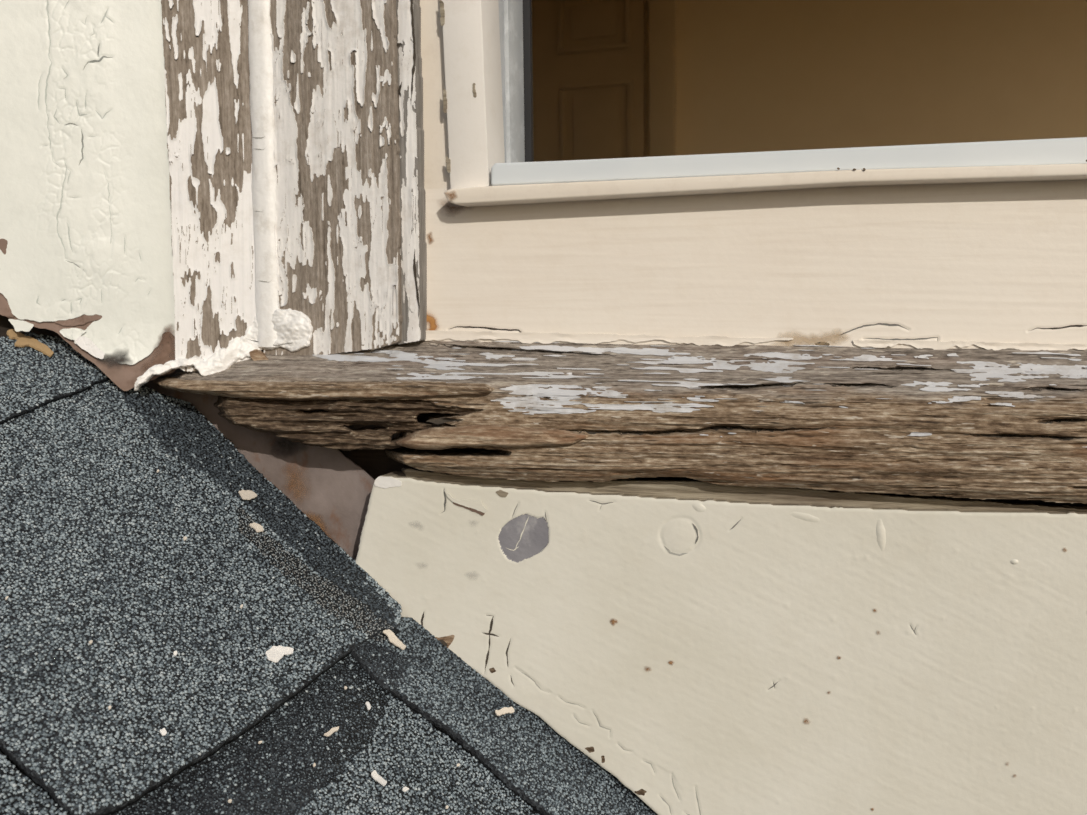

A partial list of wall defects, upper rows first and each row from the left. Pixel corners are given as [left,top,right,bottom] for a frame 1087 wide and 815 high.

crack [38,0,150,294]
peeling [163,0,256,372]
peeling [270,0,1087,415]
peeling [0,294,34,332]
peeling [55,314,105,359]
crack [839,323,938,341]
crack [1033,323,1087,331]
peeling [238,490,257,500]
peeling [374,477,402,489]
peeling [444,490,487,516]
peeling [498,514,549,563]